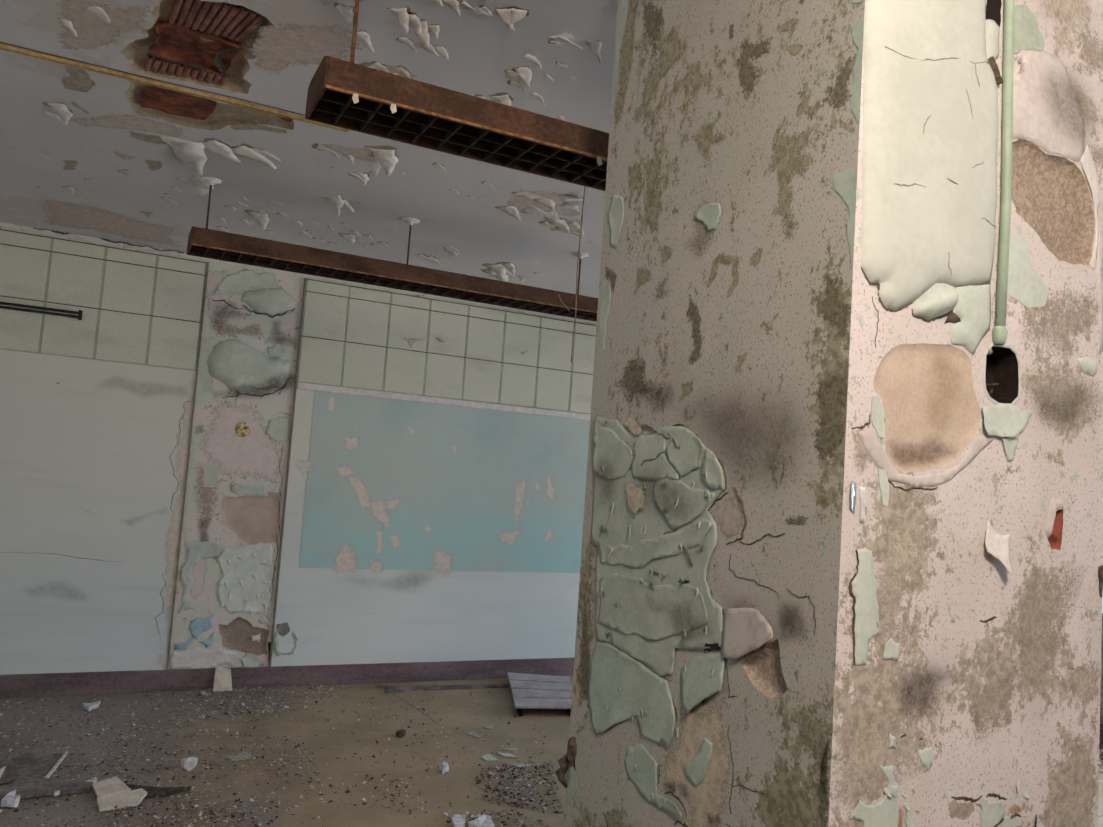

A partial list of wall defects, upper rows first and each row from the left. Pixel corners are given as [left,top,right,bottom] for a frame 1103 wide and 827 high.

spalling [139,86,217,120]
peeling [130,131,281,197]
flaking render [149,0,417,79]
peeling [311,143,399,185]
peeling [764,91,814,240]
peeling [811,0,1103,661]
peeling [154,287,299,669]
crack [620,424,816,635]
peeling [579,416,788,827]
spalling [92,776,147,812]
peeling [797,699,935,827]
peeling [944,792,1022,827]